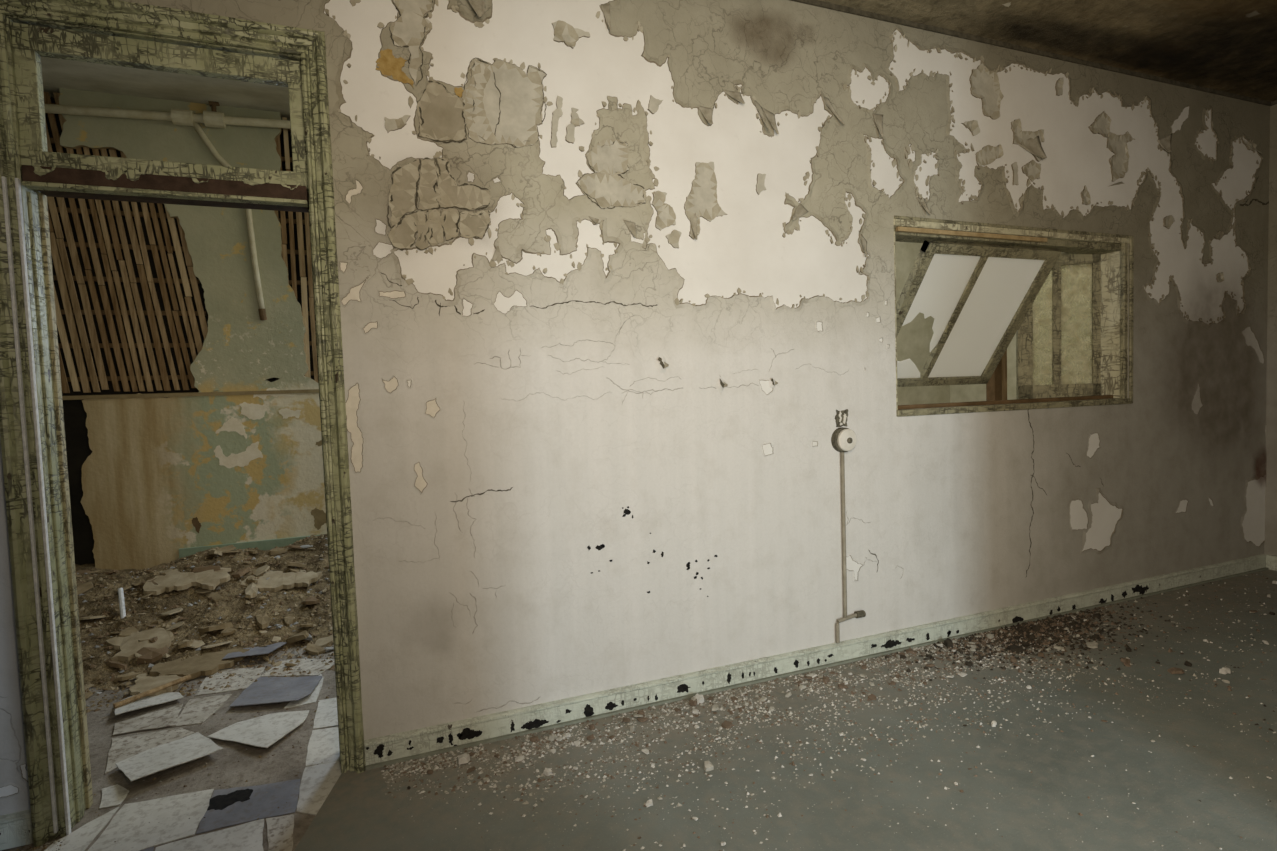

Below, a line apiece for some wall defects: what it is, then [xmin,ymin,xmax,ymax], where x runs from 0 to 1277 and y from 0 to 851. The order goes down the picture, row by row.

peeling [319,0,1265,365]
peeling [214,388,301,468]
flaking render [311,508,327,530]
peeling [1069,488,1124,554]
peeling [510,694,658,732]
peeling [366,740,414,758]
peeling [437,728,482,746]